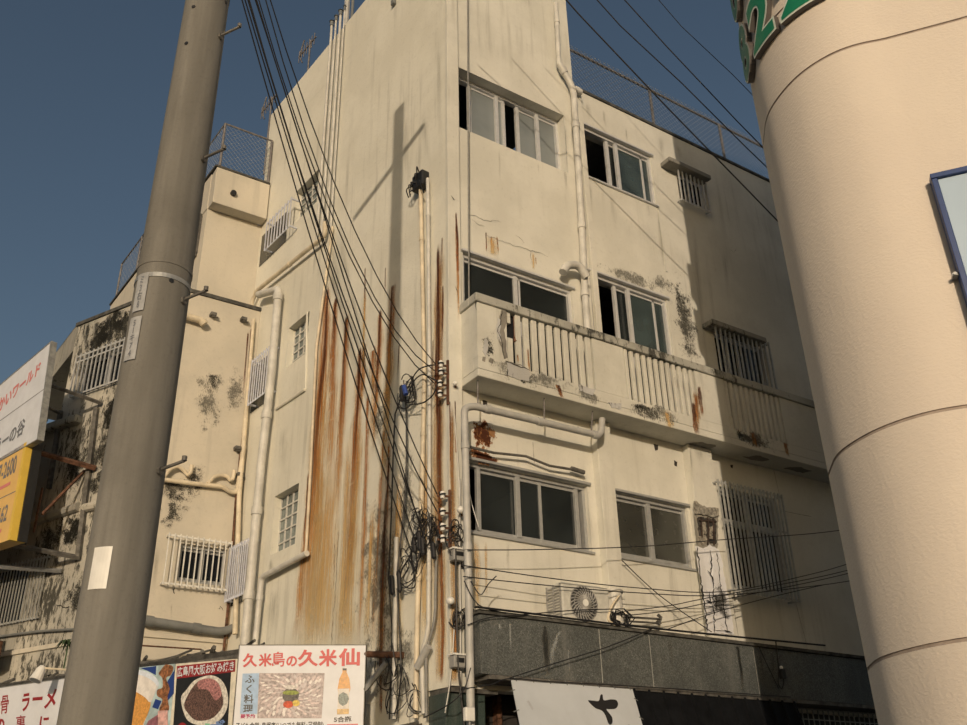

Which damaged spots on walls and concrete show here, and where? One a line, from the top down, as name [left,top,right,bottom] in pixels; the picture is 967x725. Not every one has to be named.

crack [452,197,546,265]
leakage [80,310,130,384]
peeling [482,310,530,382]
leakage [615,270,698,361]
leakage [161,467,206,527]
corrosion [296,268,402,710]
corrosion [422,251,456,678]
corrosion [469,420,497,466]
corrosion [692,387,703,431]
leakage [36,514,86,561]
spalling [693,501,719,631]
crack [707,552,732,633]